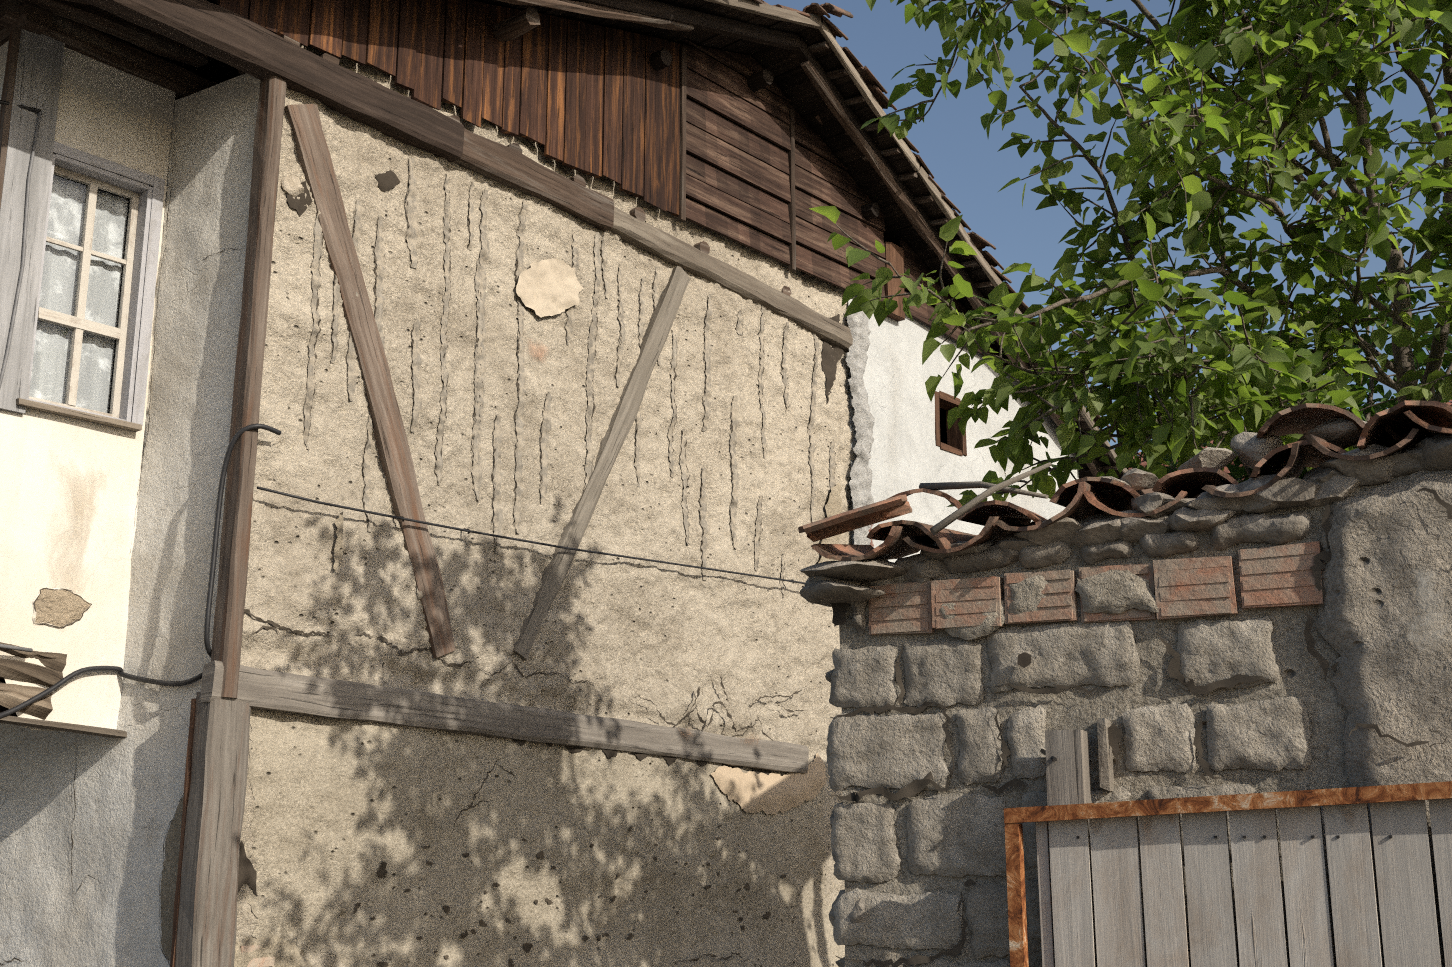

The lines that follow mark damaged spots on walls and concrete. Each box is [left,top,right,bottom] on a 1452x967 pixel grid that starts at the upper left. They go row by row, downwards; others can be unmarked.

damp [825,482,843,517]
damp [818,534,841,563]
flaking render [32,588,92,628]
flaking render [240,945,275,967]